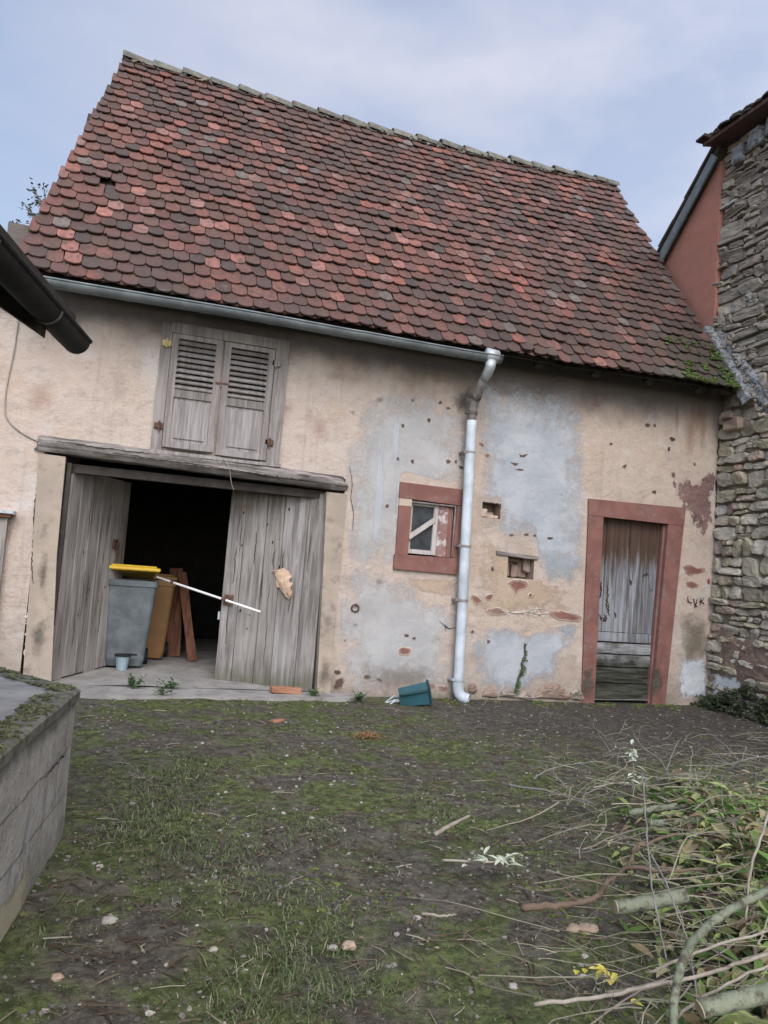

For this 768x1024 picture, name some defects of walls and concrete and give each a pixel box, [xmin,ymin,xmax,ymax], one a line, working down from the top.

peeling [672,472,715,535]
peeling [468,388,584,700]
peeling [684,565,710,589]